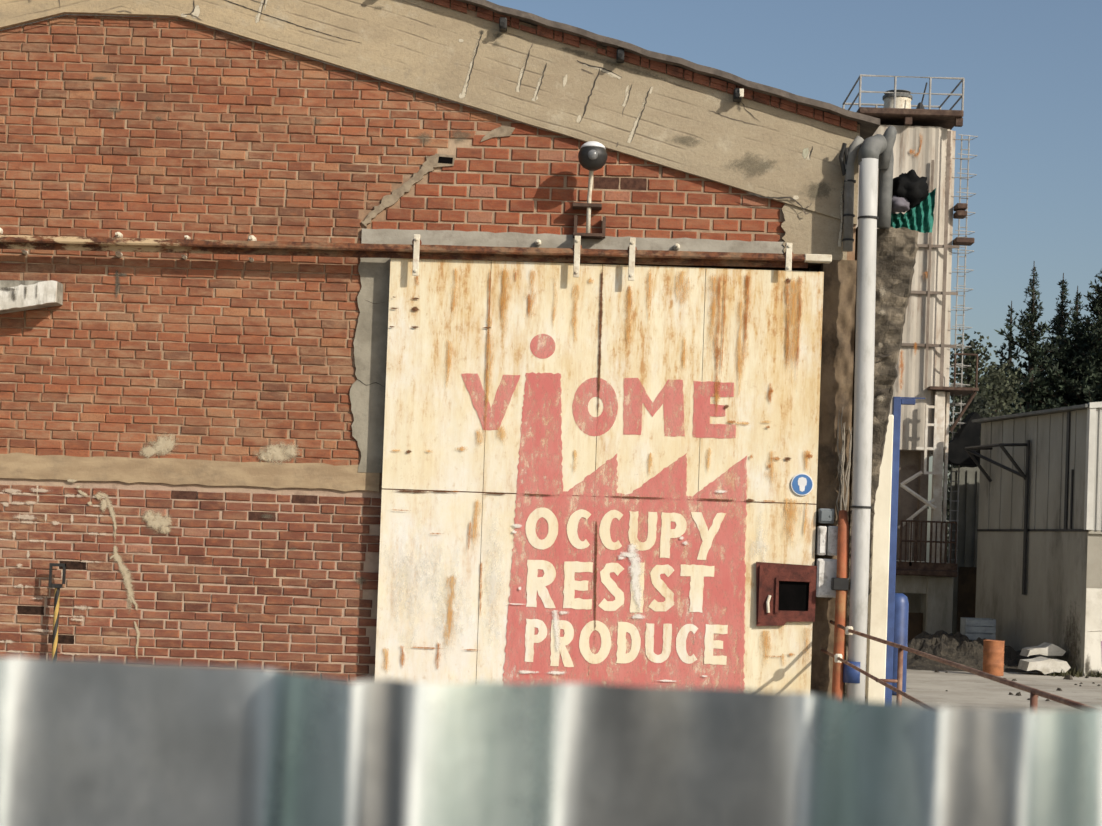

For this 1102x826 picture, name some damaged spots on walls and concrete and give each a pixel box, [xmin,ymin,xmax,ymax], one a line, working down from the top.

crack [0,0,653,147]
hole [436,154,456,167]
corrosion [483,270,516,402]
corrosion [528,271,536,313]
corrosion [572,272,603,410]
corrosion [711,275,750,425]
corrosion [785,277,802,365]
corrosion [468,492,507,548]
corrosion [746,499,807,536]